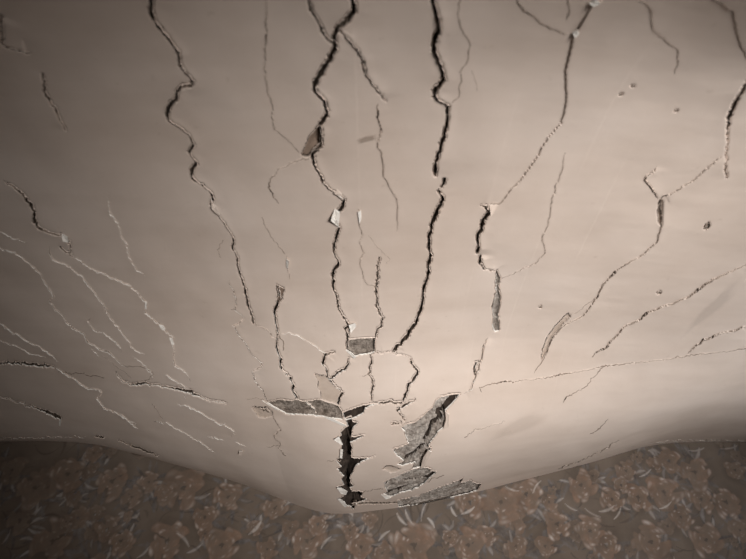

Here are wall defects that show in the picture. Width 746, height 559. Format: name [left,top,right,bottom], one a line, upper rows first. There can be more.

crack [713,0,746,57]
peeling [301,123,322,156]
crack [475,0,600,279]
crack [148,0,478,456]
crack [465,80,746,402]
crack [0,181,245,455]
spalling [346,337,376,358]
spalling [492,270,501,332]
peeling [541,313,570,359]
spalling [252,374,482,509]
crack [352,498,398,506]